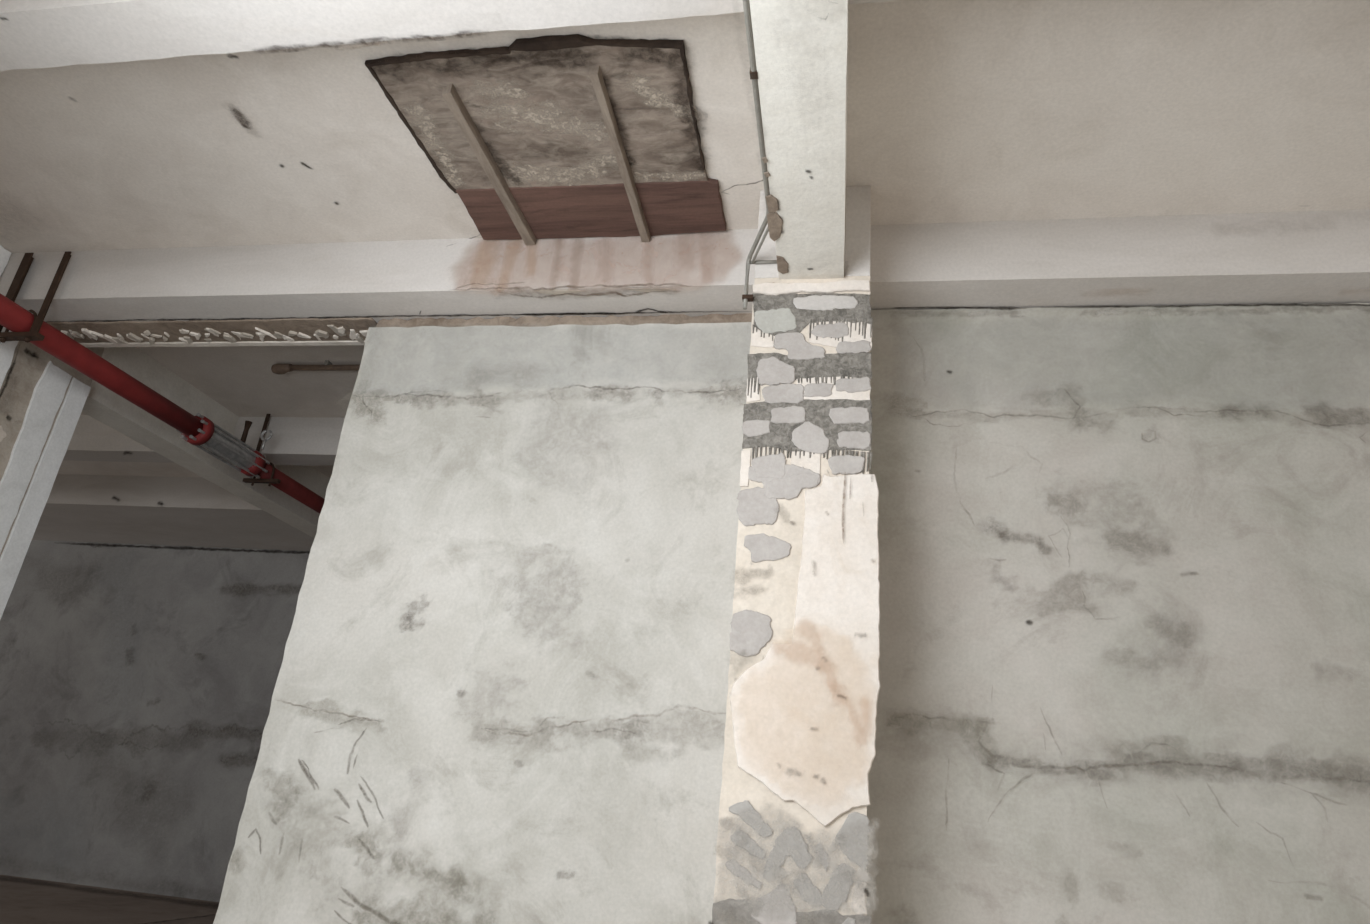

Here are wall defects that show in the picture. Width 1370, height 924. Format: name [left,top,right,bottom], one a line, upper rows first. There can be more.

flaking render [729,474,881,827]